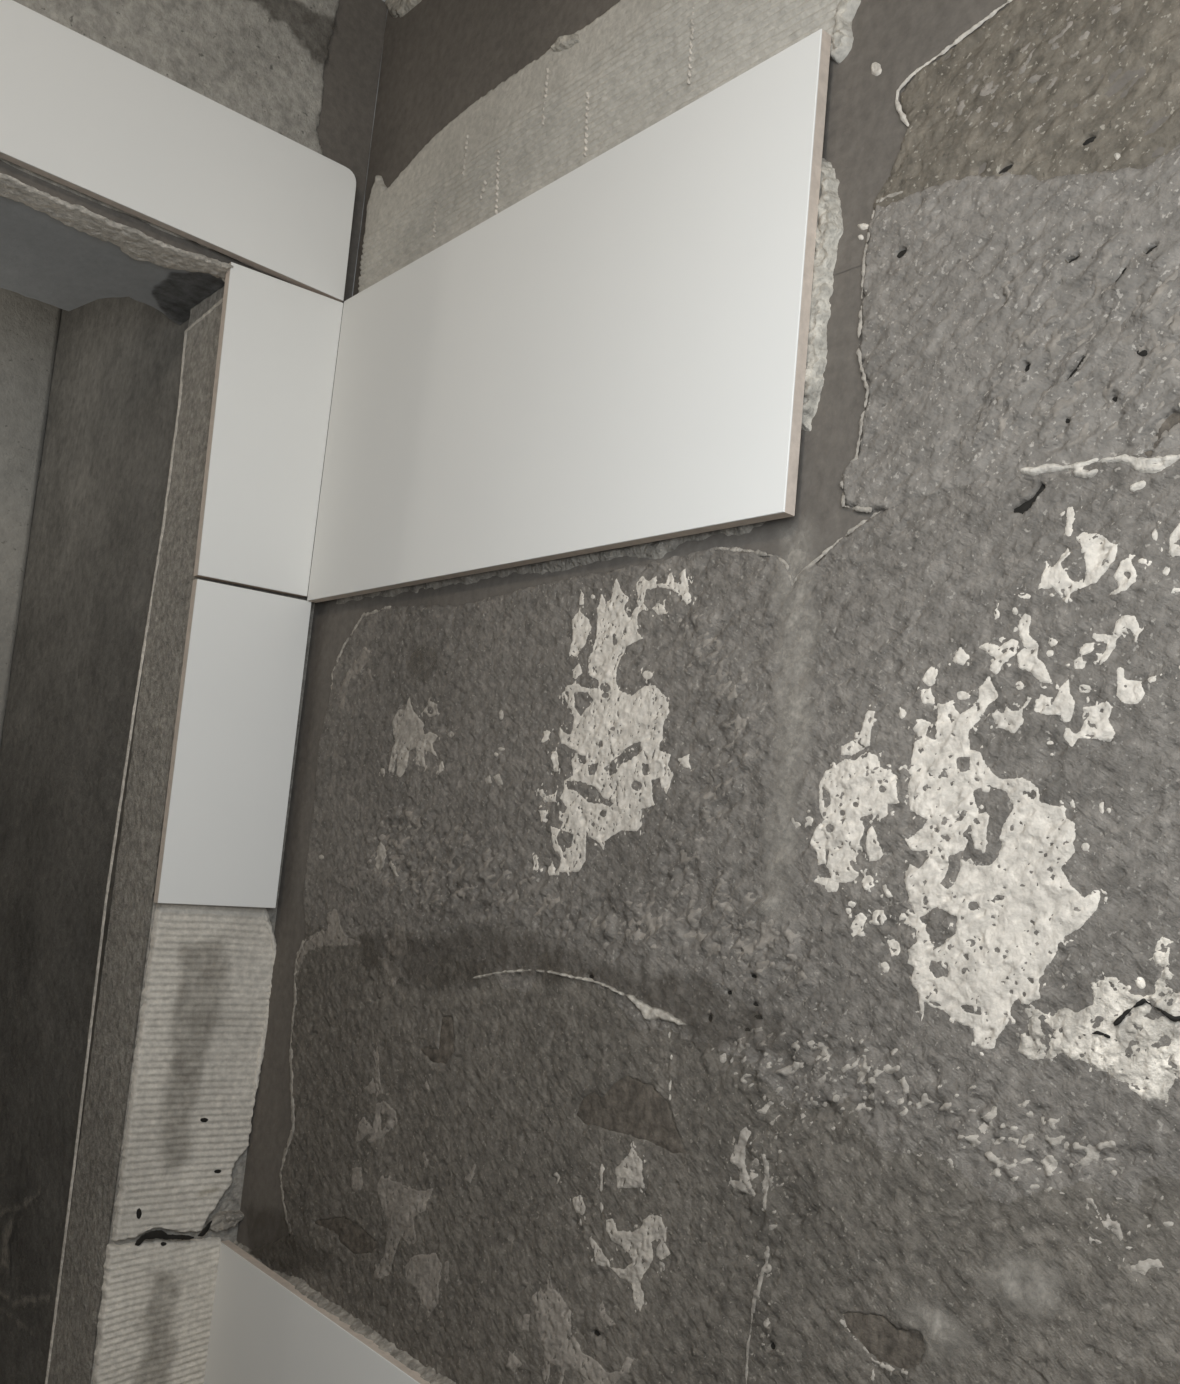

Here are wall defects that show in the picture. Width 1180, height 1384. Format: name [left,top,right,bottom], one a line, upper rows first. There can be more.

water stain [261,0,333,63]
peeling [364,507,1180,1230]
peeling [296,906,360,976]
peeling [315,1042,450,1319]
crack [135,1221,212,1246]
peeling [1085,1198,1164,1285]
peeling [746,1251,775,1355]